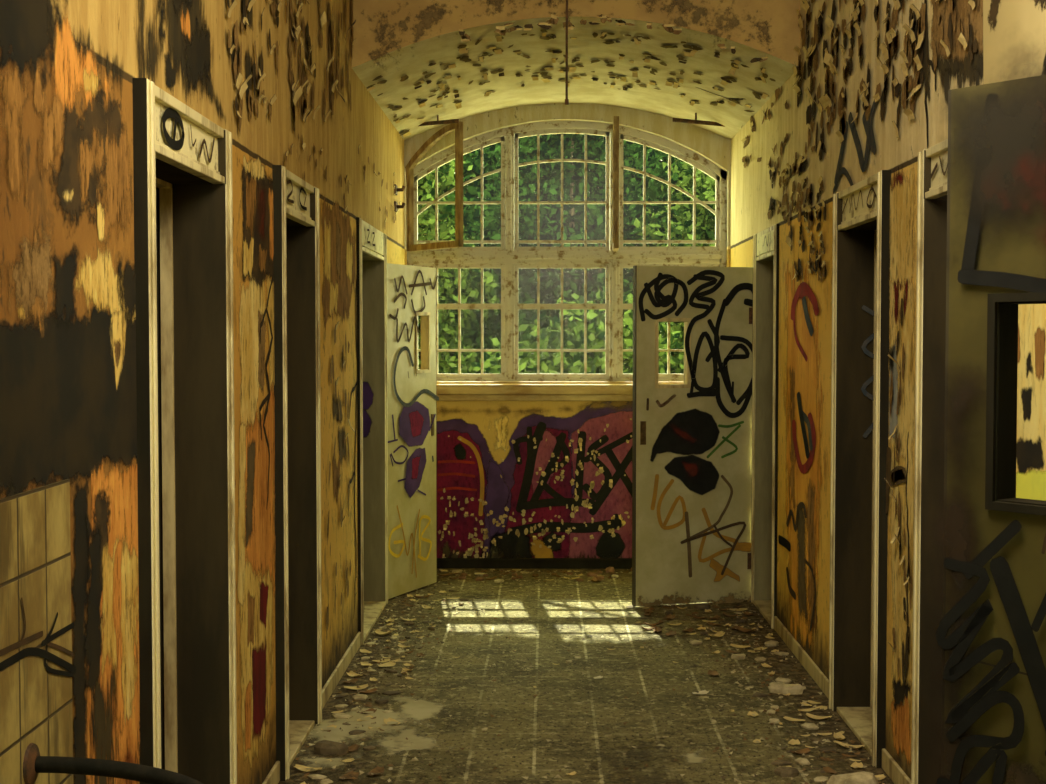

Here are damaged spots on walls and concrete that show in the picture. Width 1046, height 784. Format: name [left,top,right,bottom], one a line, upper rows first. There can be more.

peeling [0,18,136,389]
peeling [227,0,356,181]